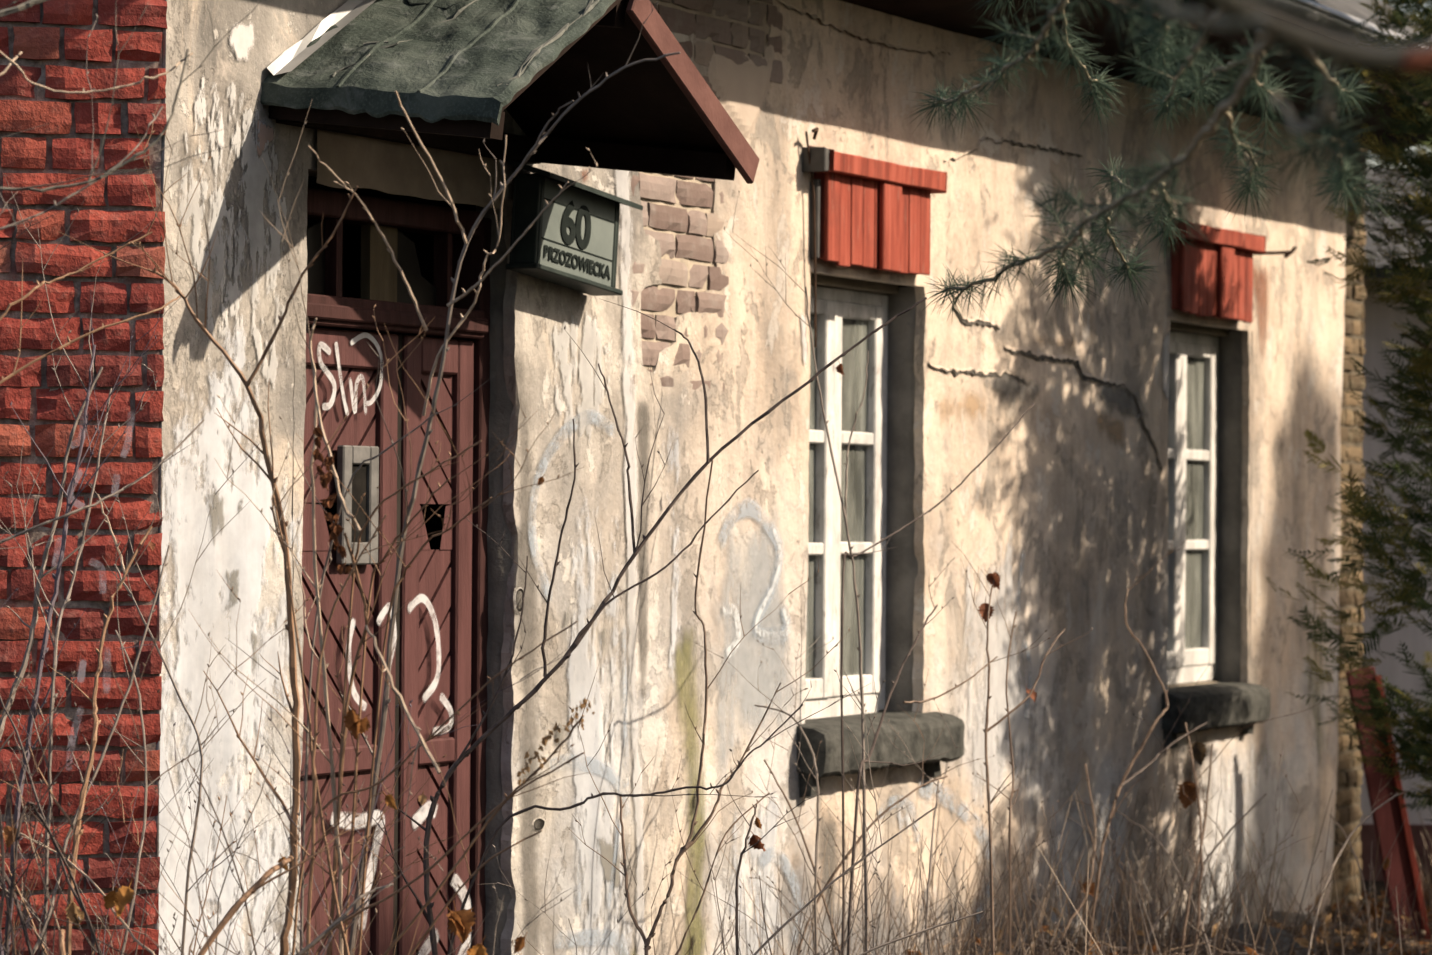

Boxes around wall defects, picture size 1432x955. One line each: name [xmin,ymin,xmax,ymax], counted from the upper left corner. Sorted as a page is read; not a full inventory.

flaking render [651,0,783,100]
crack [944,135,1083,162]
crack [930,306,1162,472]
flaking render [551,170,729,955]